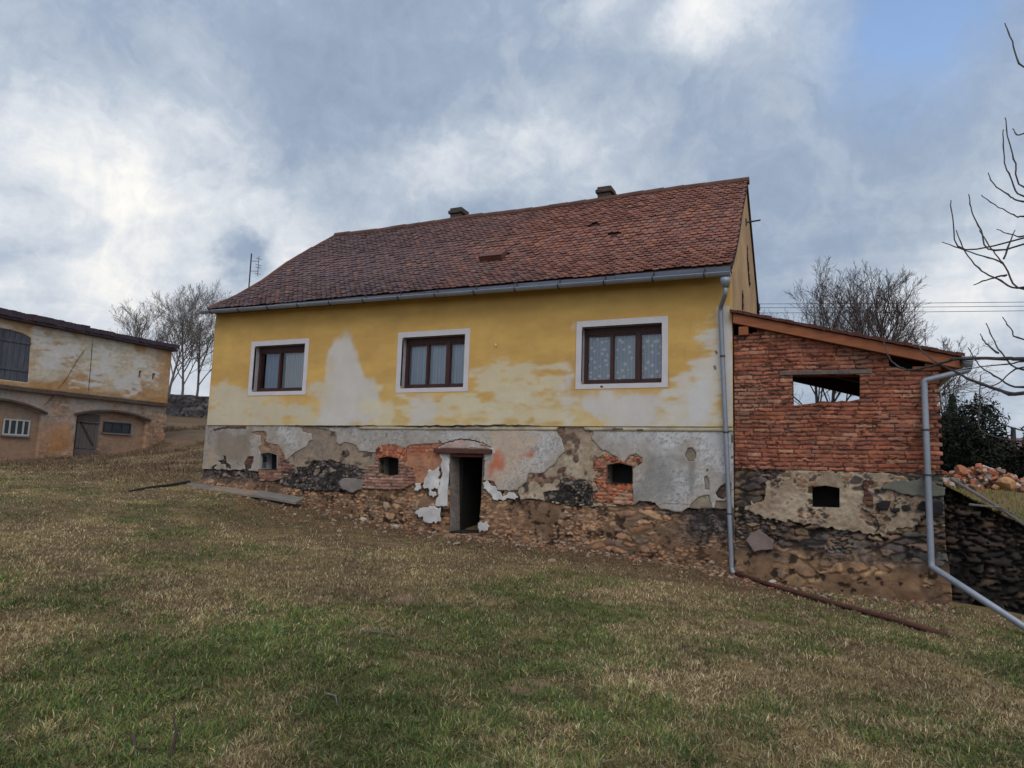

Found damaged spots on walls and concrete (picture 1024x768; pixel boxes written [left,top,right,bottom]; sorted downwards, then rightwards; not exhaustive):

peeling [29,325,164,398]
peeling [207,302,733,523]
peeling [744,470,944,538]